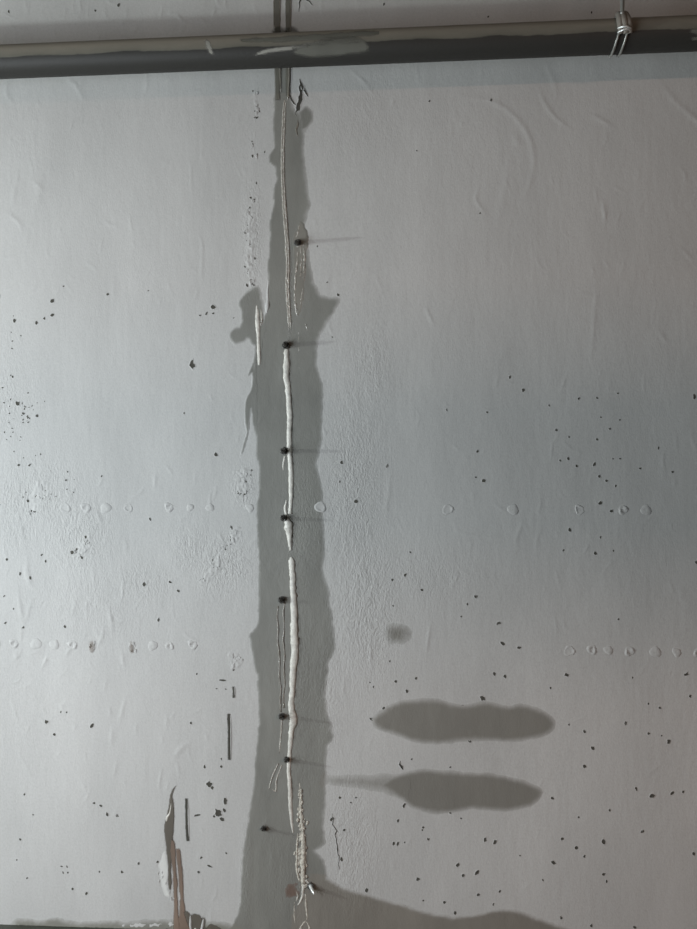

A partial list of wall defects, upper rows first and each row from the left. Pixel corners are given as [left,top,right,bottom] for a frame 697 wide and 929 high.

crack [280,79,308,856]
peeling [158,851,174,903]